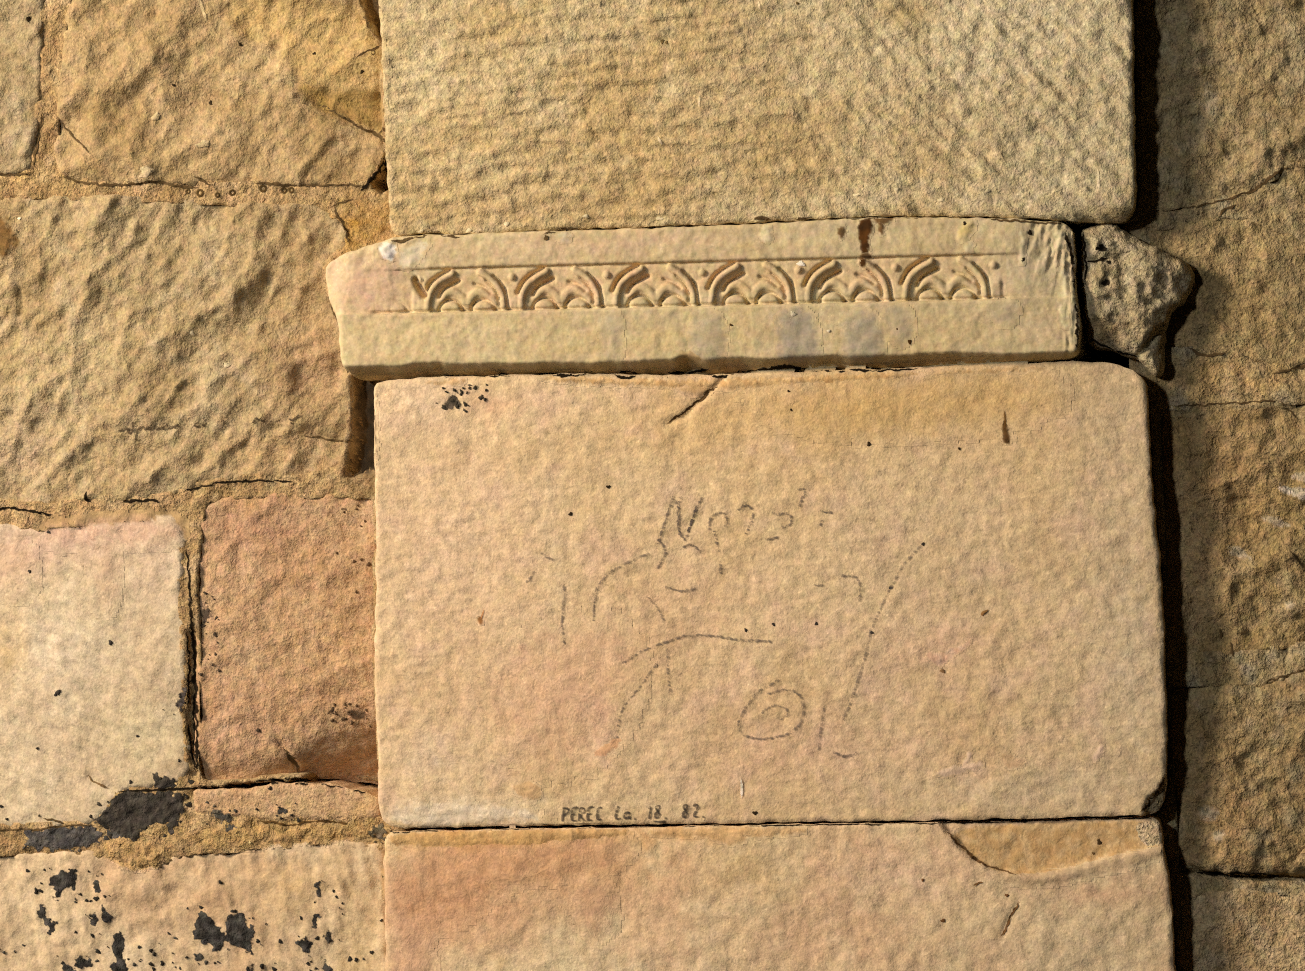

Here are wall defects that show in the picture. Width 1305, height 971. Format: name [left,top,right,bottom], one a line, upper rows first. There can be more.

corrosion [835,213,896,270]
crack [553,364,917,424]
damp [22,772,276,971]
damp [278,880,343,971]
damp [347,799,641,971]
spalling [947,774,1180,897]